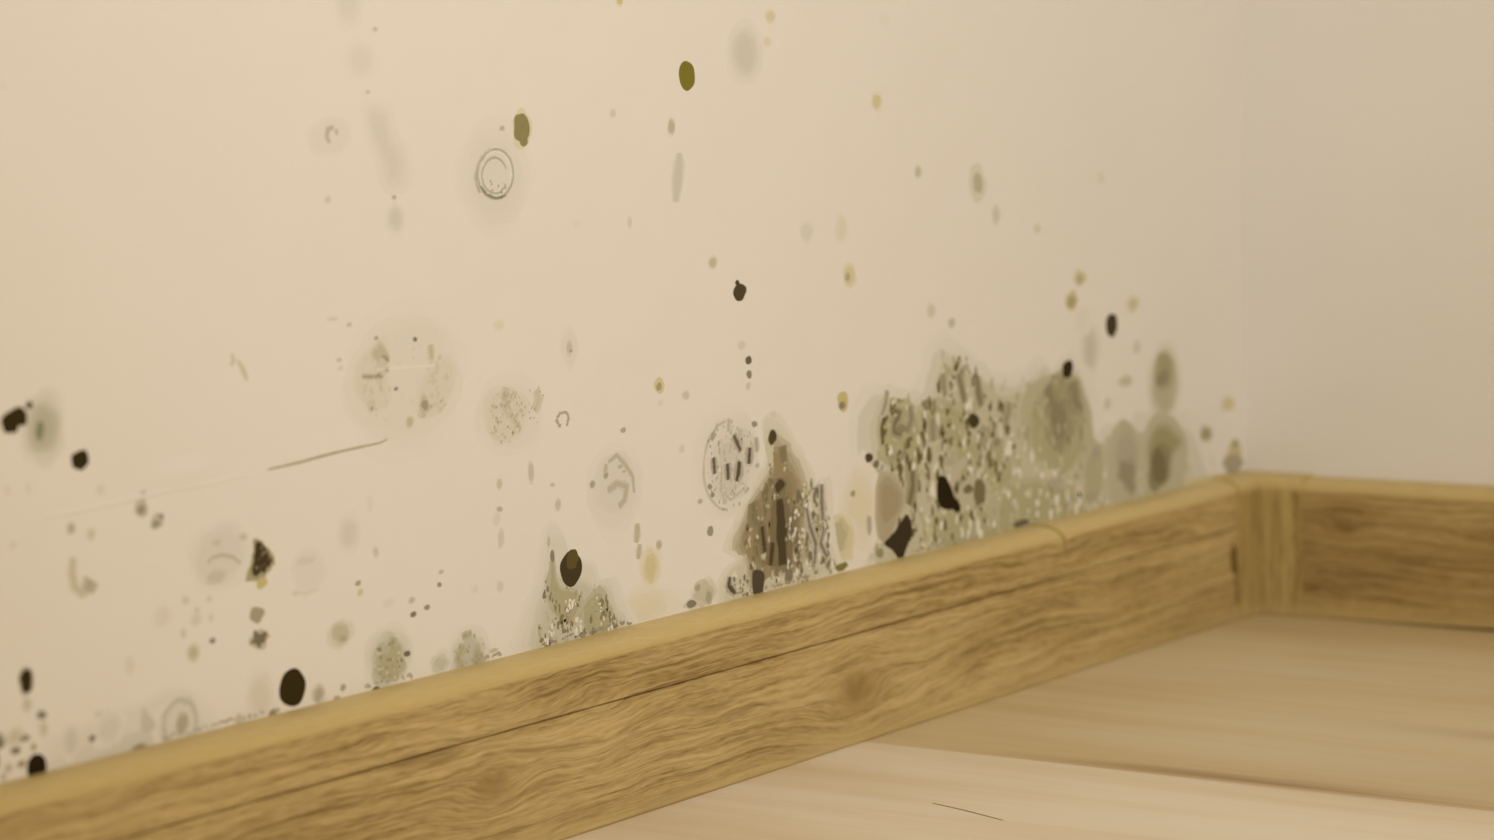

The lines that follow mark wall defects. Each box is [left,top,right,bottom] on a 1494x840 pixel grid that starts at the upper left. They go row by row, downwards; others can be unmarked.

mould [1,384,89,497]
mould [135,490,164,530]
crack [267,439,387,471]
water stain [326,270,1244,690]
mould [66,557,99,599]
mould [150,495,379,664]
water stain [0,607,346,781]